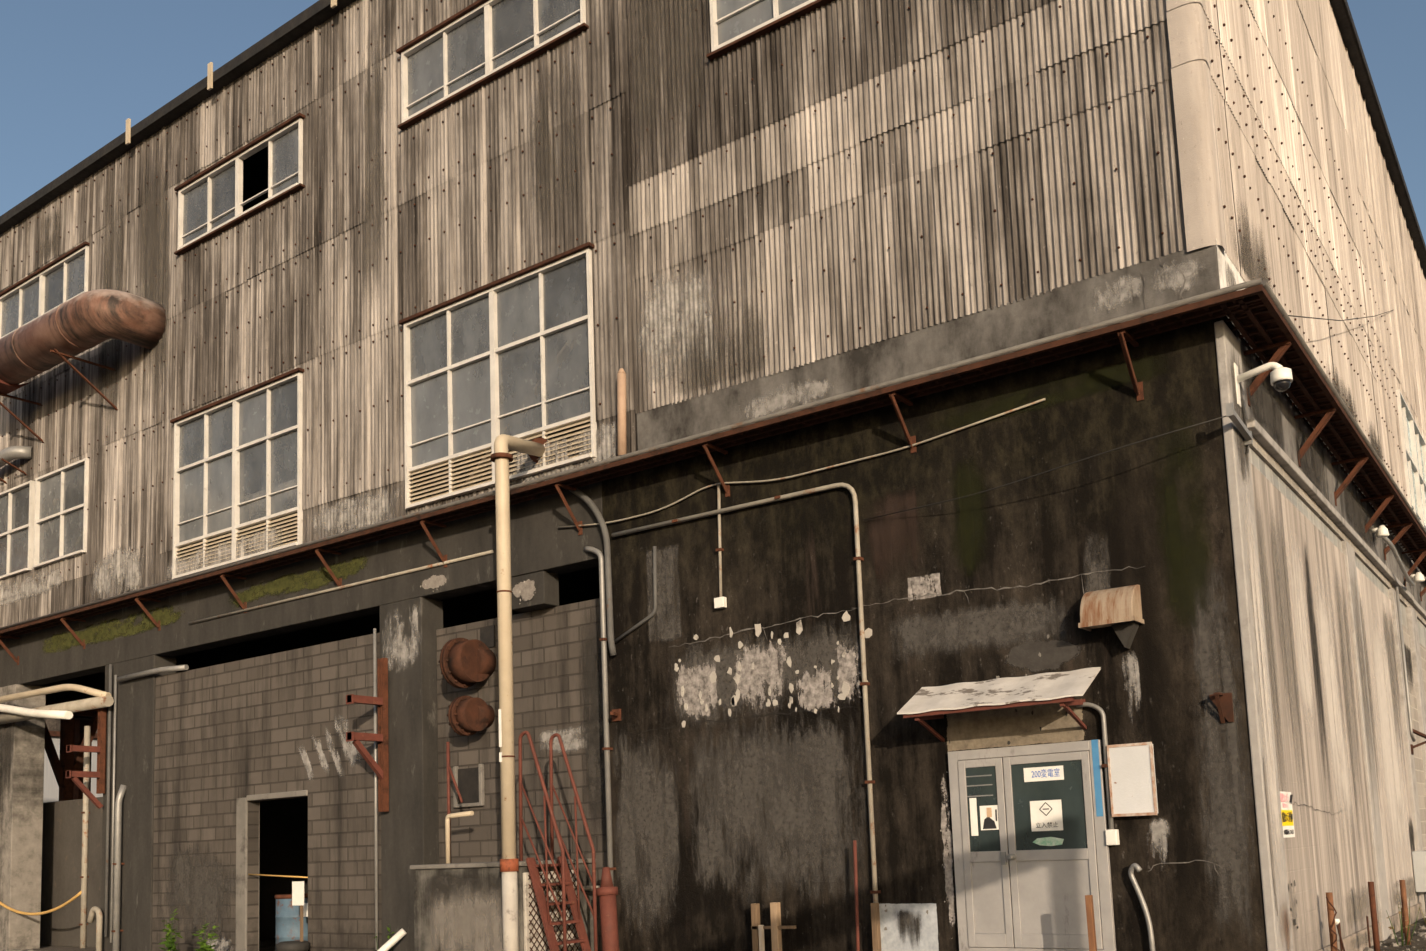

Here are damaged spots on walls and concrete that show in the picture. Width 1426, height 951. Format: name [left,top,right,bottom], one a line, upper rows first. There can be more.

damp [1225,217,1269,286]
damp [1344,490,1378,546]
damp [541,628,868,927]
peeling [673,611,872,728]
damp [1191,573,1254,926]
damp [1248,514,1412,853]